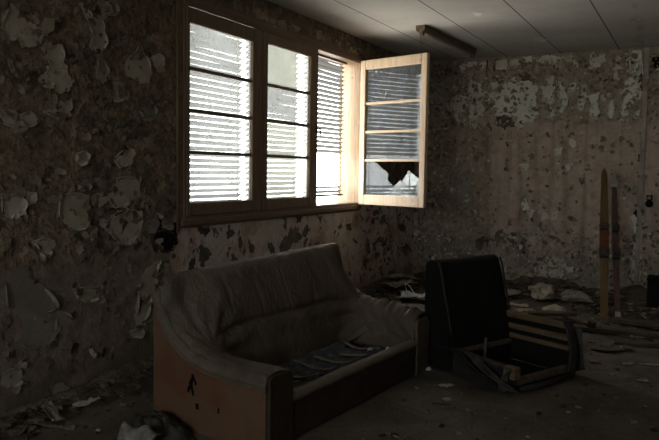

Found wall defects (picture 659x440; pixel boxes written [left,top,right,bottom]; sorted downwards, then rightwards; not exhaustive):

peeling [0,0,178,345]
spalling [183,225,255,270]
spalling [267,216,320,254]
peeling [334,48,659,288]